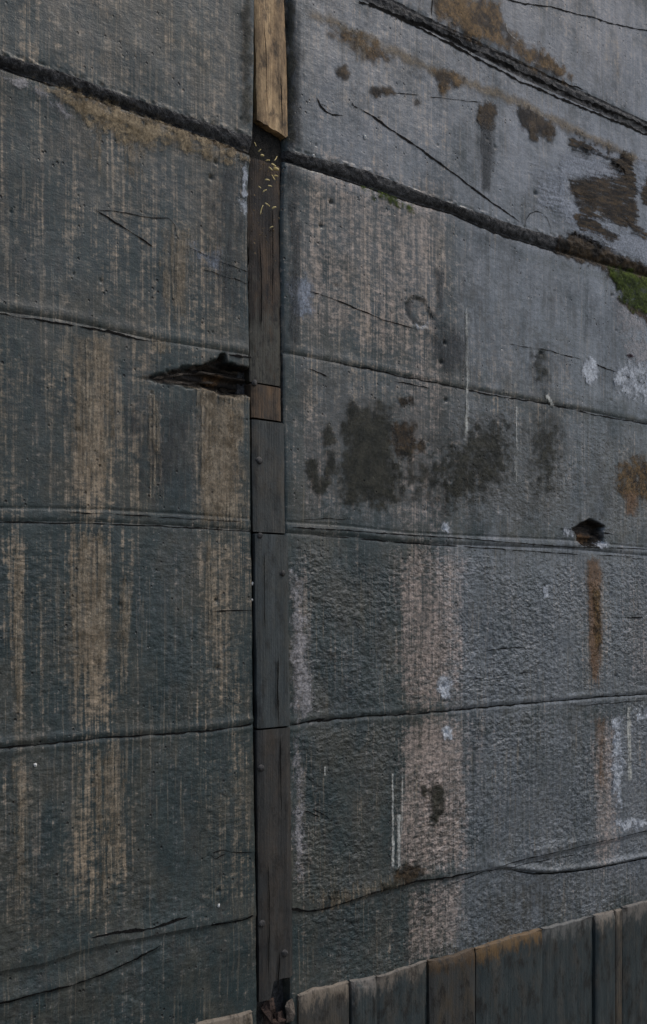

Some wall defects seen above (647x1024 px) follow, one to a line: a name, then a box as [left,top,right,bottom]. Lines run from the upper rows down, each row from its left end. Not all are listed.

leakage [12,77,249,313]
crack [290,99,592,262]
leakage [462,79,647,191]
leakage [529,154,647,281]
spalling [146,357,250,401]
leakage [305,315,517,533]
spalling [560,521,611,549]
rust [616,455,647,515]
rust [588,559,602,682]
leakage [421,785,445,825]
crack [0,916,188,1004]
crack [211,915,253,926]